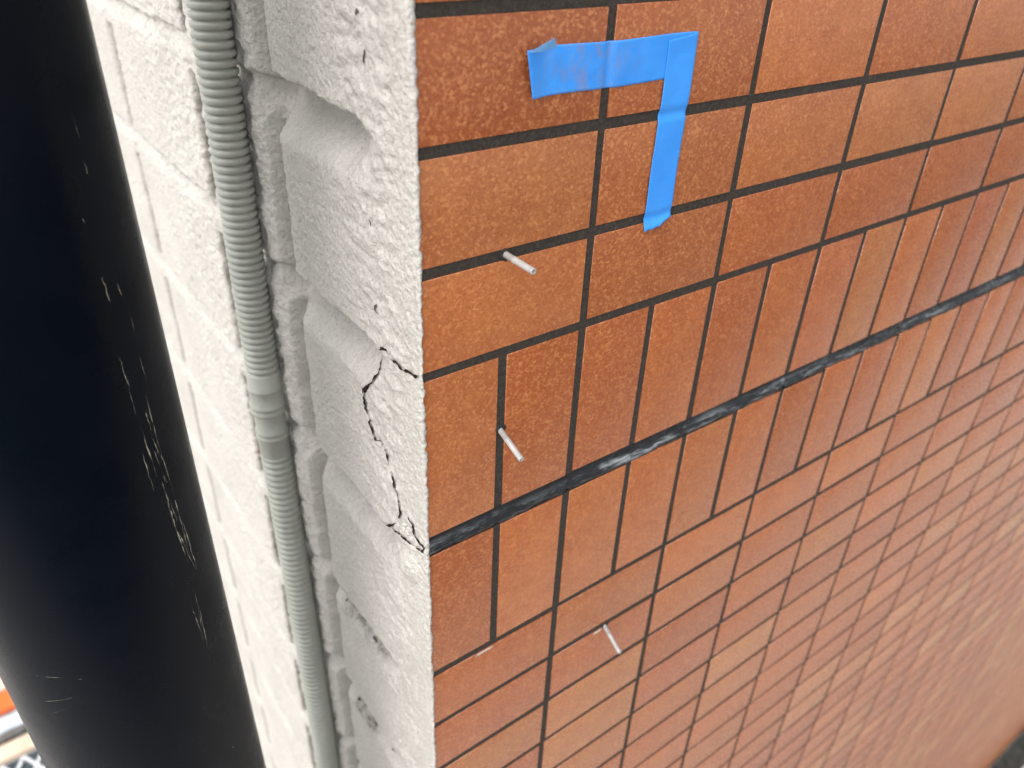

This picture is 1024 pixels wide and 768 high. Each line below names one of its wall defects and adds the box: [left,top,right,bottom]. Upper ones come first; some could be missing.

crack [362,347,424,553]